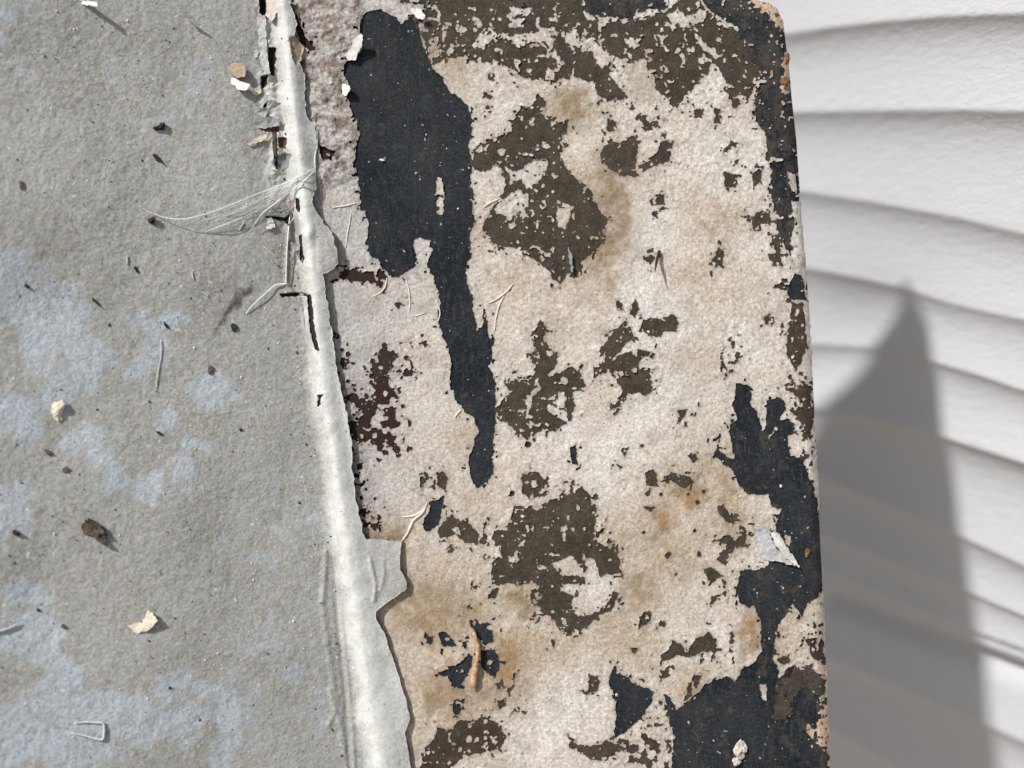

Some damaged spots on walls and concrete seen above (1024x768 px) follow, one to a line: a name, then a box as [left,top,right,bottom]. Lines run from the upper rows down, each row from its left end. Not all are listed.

peeling [229,0,291,171]
spalling [289,36,304,65]
spalling [319,145,335,160]
peeling [330,0,831,768]